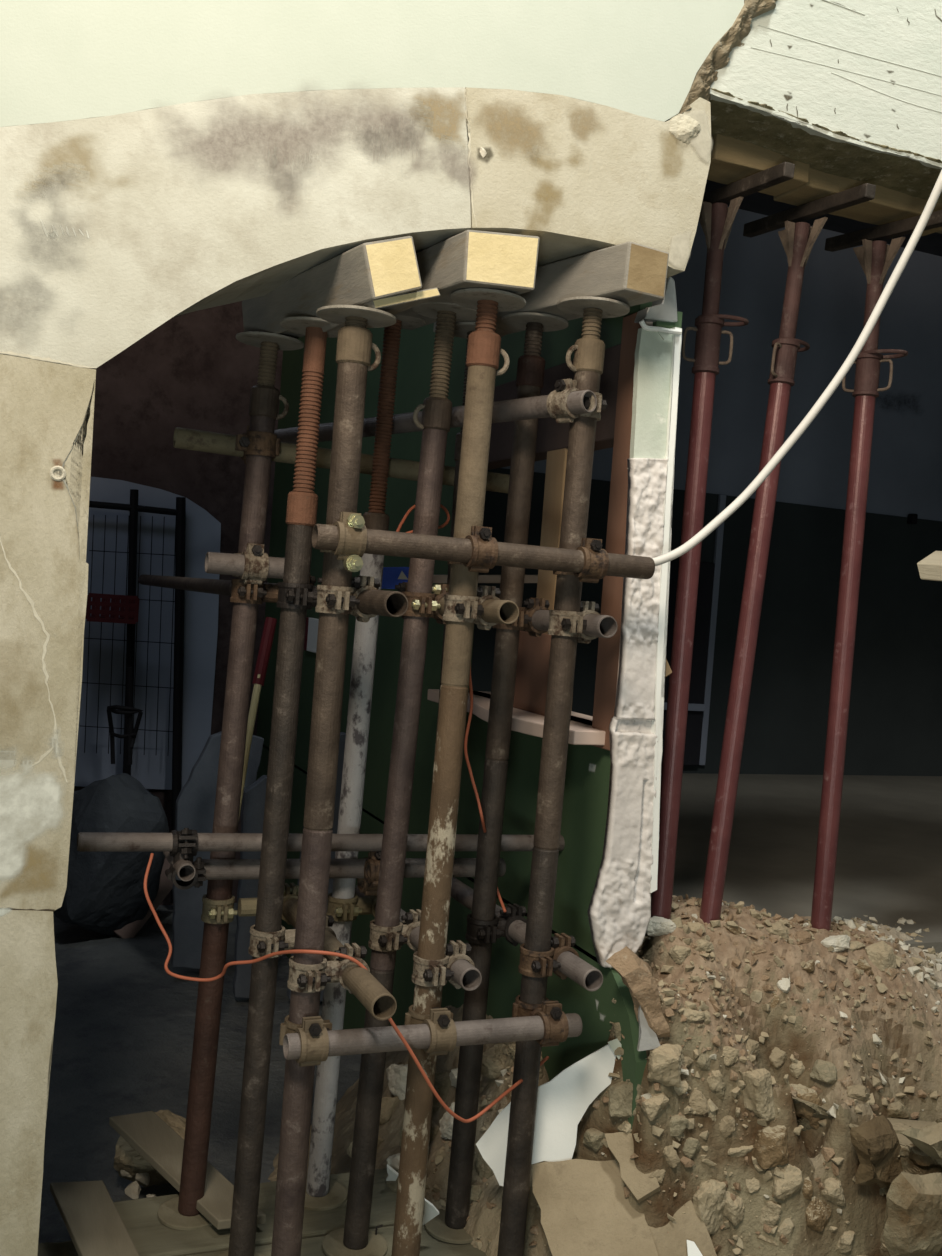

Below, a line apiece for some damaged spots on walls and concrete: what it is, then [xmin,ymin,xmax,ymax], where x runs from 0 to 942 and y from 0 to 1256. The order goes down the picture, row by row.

leakage [198,116,341,167]
leakage [358,98,461,139]
spalling [667,0,942,203]
crack [0,537,68,783]